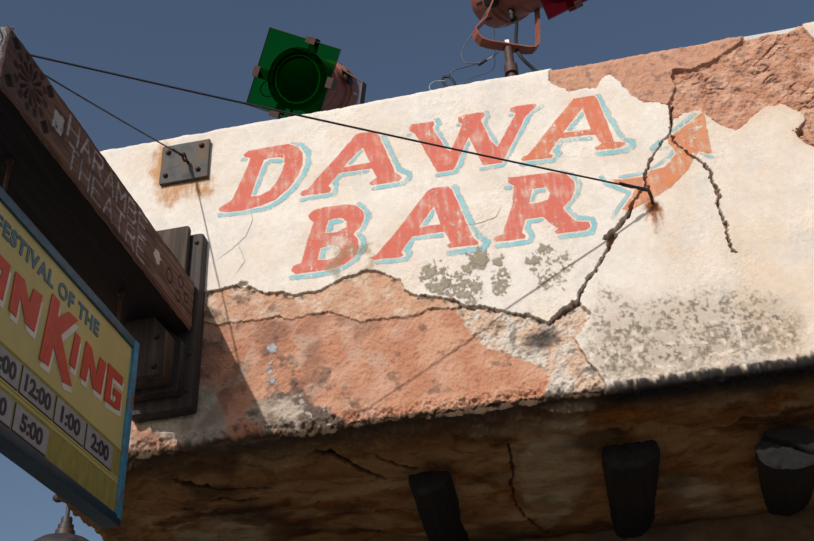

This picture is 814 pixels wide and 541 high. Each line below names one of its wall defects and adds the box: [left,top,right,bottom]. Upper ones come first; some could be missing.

spalling [548,24,814,147]
crack [549,122,735,326]
corrosion [645,201,661,219]
spalling [128,243,606,458]
leakage [588,296,814,401]
crack [316,448,414,480]
crack [507,443,549,533]